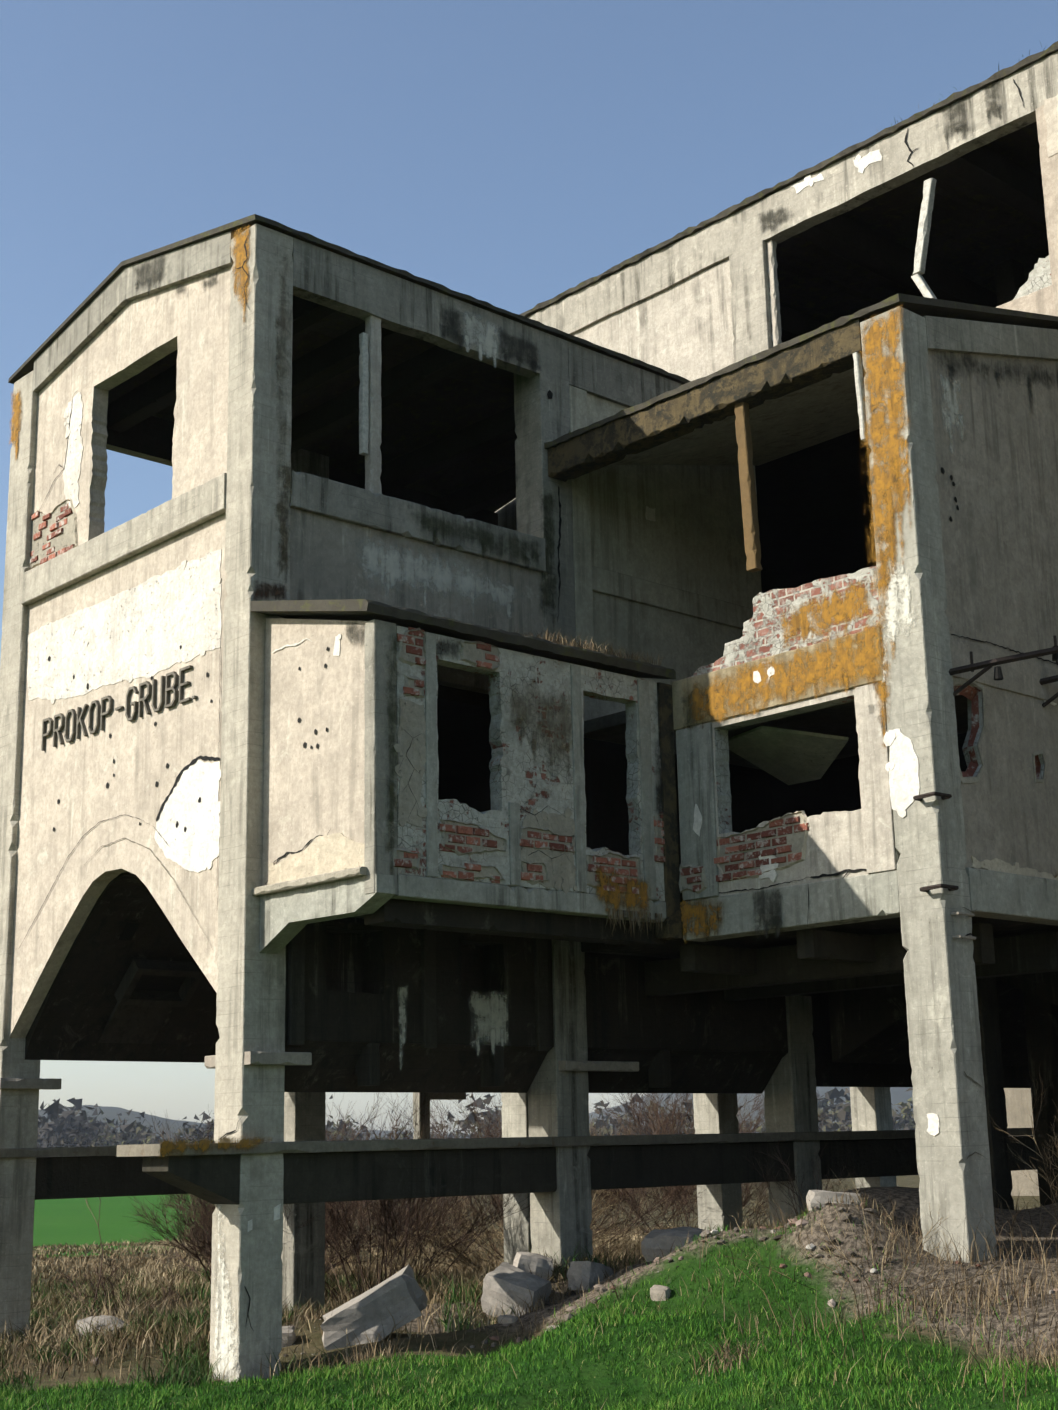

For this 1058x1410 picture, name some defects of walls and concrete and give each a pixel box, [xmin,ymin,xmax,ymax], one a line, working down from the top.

crack [904,128,918,167]
corrosion [233,226,250,322]
corrosion [10,392,21,459]
flaking render [29,392,84,569]
corrosion [687,307,910,746]
spalling [139,756,221,873]
crack [265,828,331,884]
flaking render [393,627,810,894]
corrosion [597,869,649,914]
peeling [883,728,920,818]
water stain [471,994,508,1054]